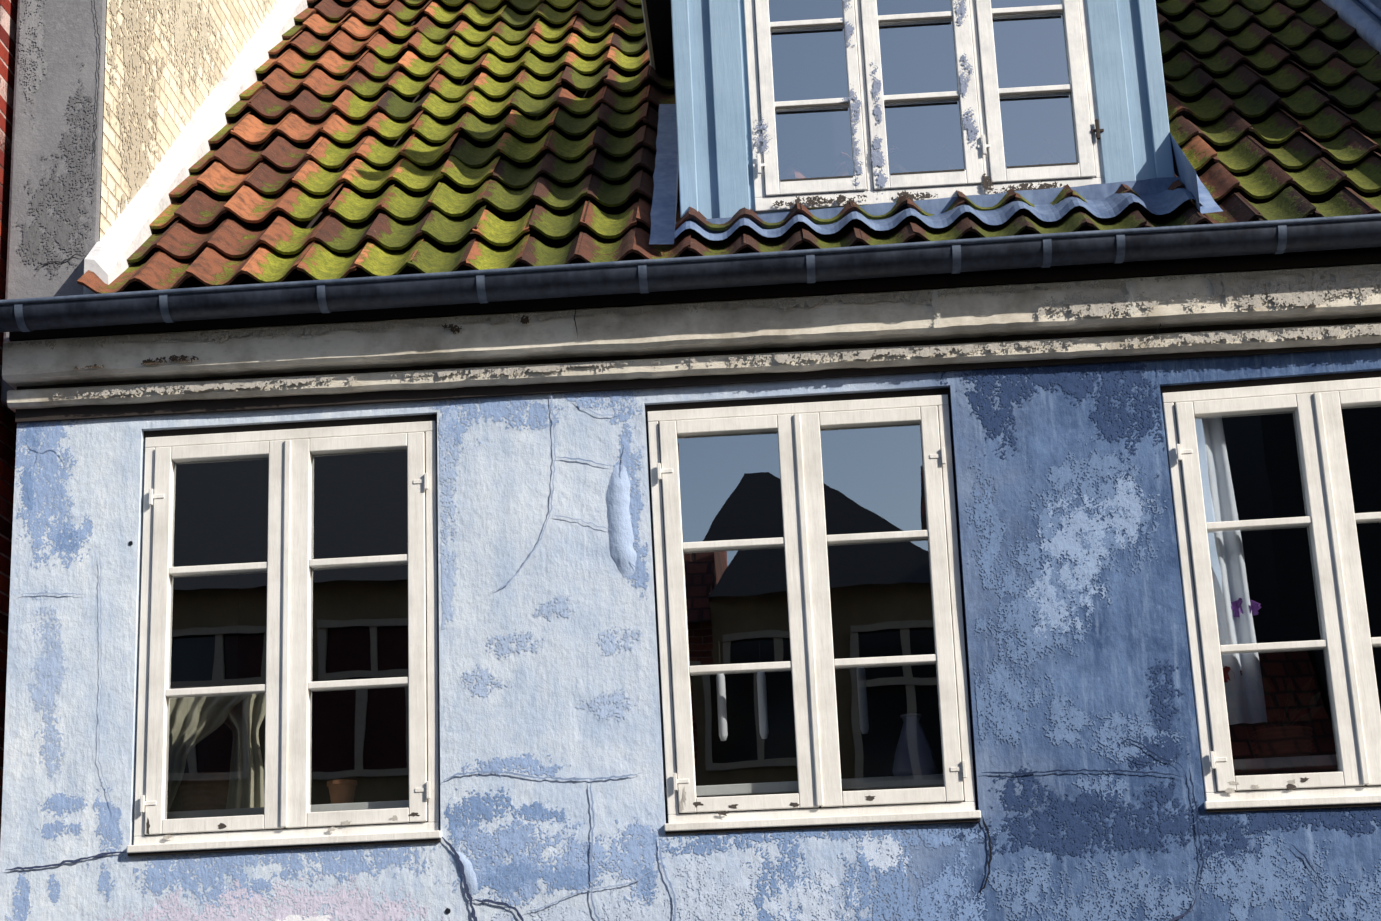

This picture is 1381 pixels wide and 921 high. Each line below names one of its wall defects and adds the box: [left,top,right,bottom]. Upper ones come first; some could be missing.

damp [7,264,1381,350]
crack [490,393,625,593]
damp [934,362,1176,482]
peeling [964,437,1190,805]
crack [6,556,124,871]
flaking render [80,786,912,921]
crack [442,770,640,921]
damp [633,863,659,907]
damp [639,763,1381,921]